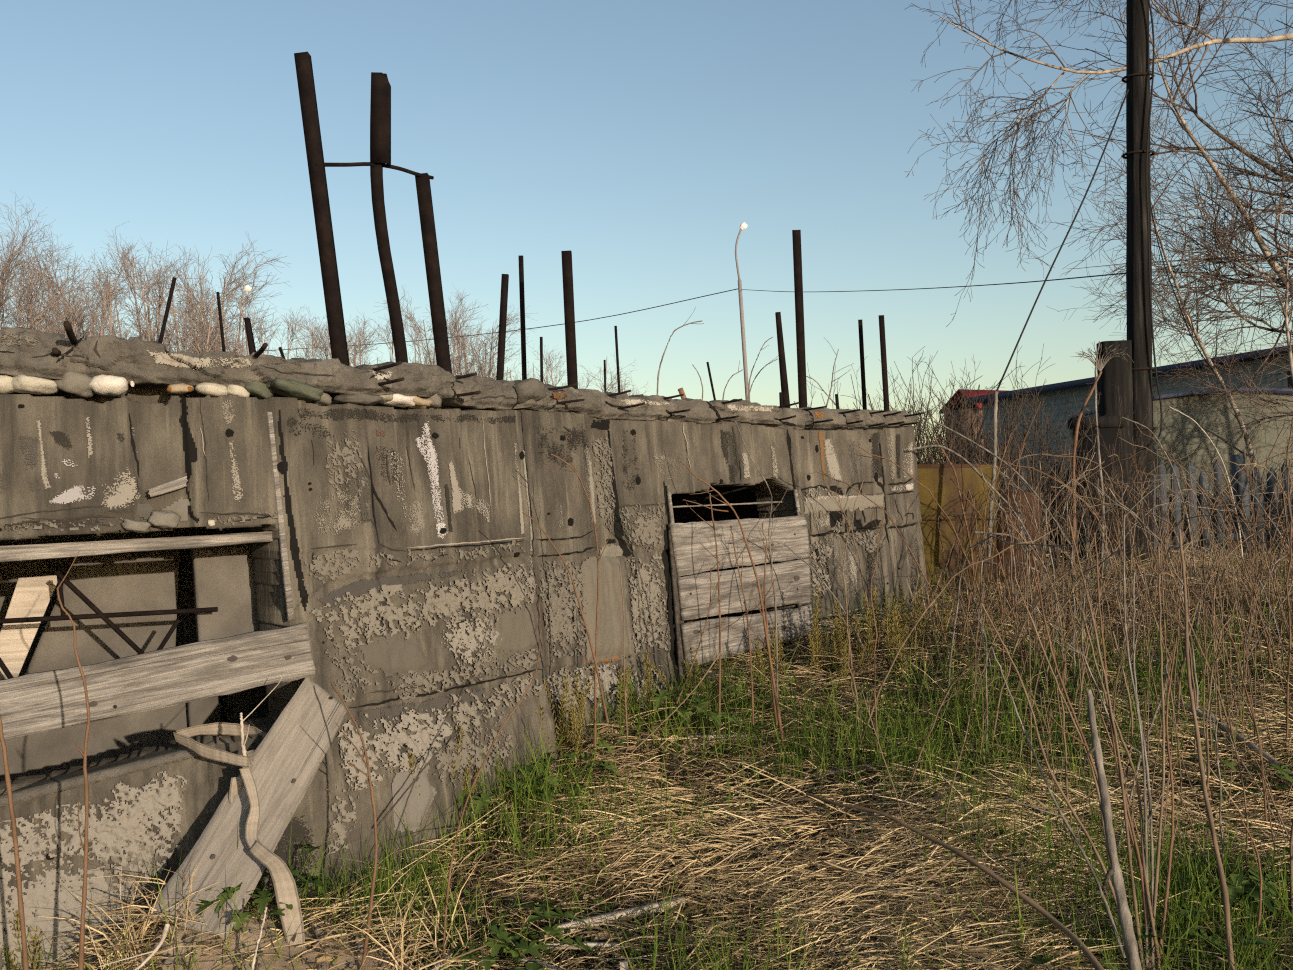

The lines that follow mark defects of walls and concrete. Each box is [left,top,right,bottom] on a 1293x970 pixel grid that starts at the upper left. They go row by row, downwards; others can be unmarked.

damp [287,408,516,539]
spalling [303,430,673,854]
spalling [0,771,188,970]